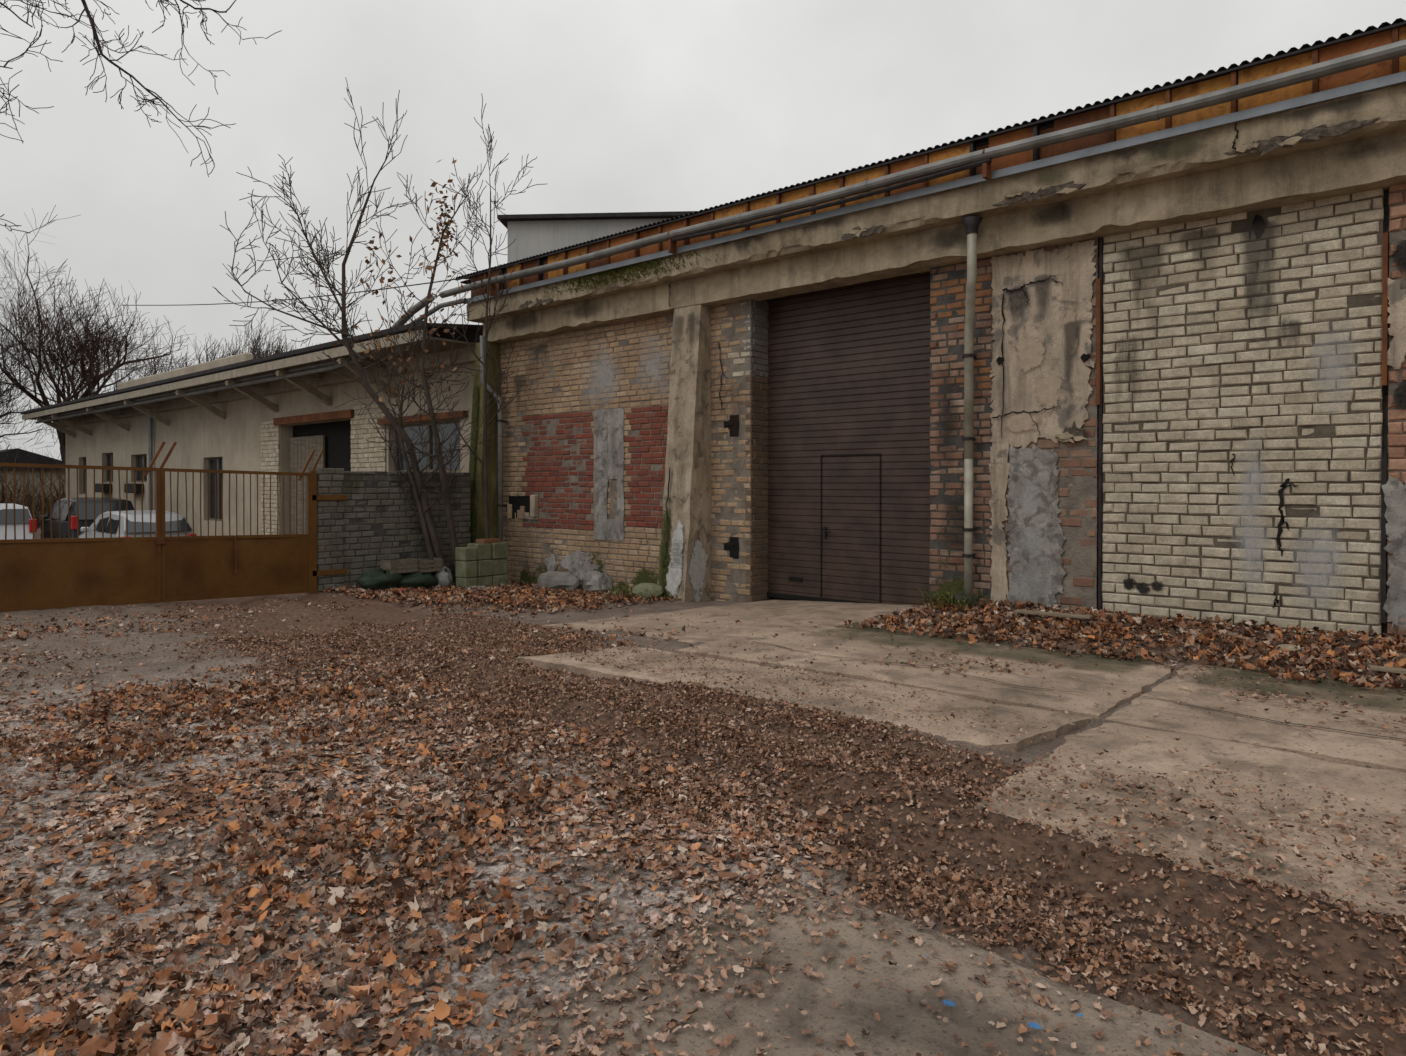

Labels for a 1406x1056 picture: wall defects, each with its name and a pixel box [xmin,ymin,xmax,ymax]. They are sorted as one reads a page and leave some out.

peeling [1387,240,1406,409]
peeling [989,240,1098,609]
crack [1276,478,1299,556]
peeling [1381,474,1406,630]